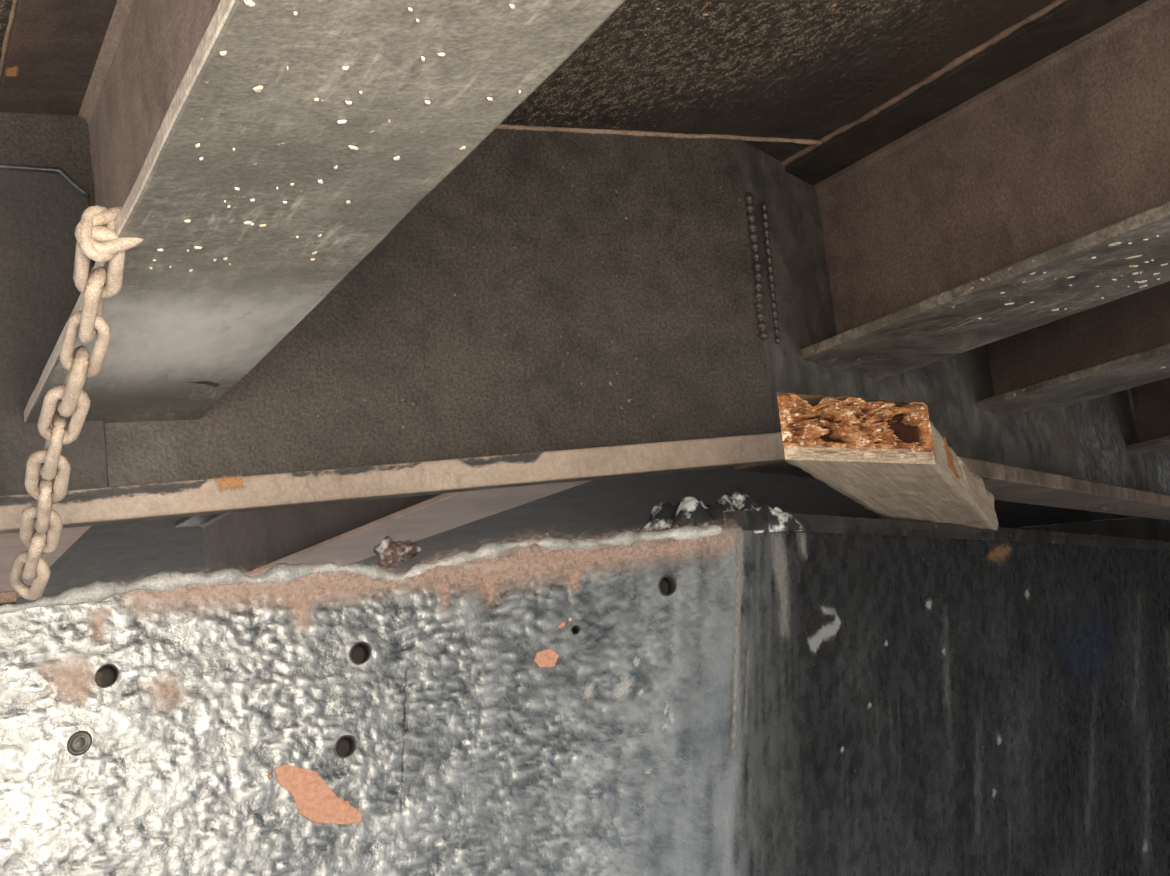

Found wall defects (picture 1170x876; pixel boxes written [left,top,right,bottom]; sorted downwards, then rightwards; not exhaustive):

peeling [534,649,559,668]
peeling [267,764,362,825]